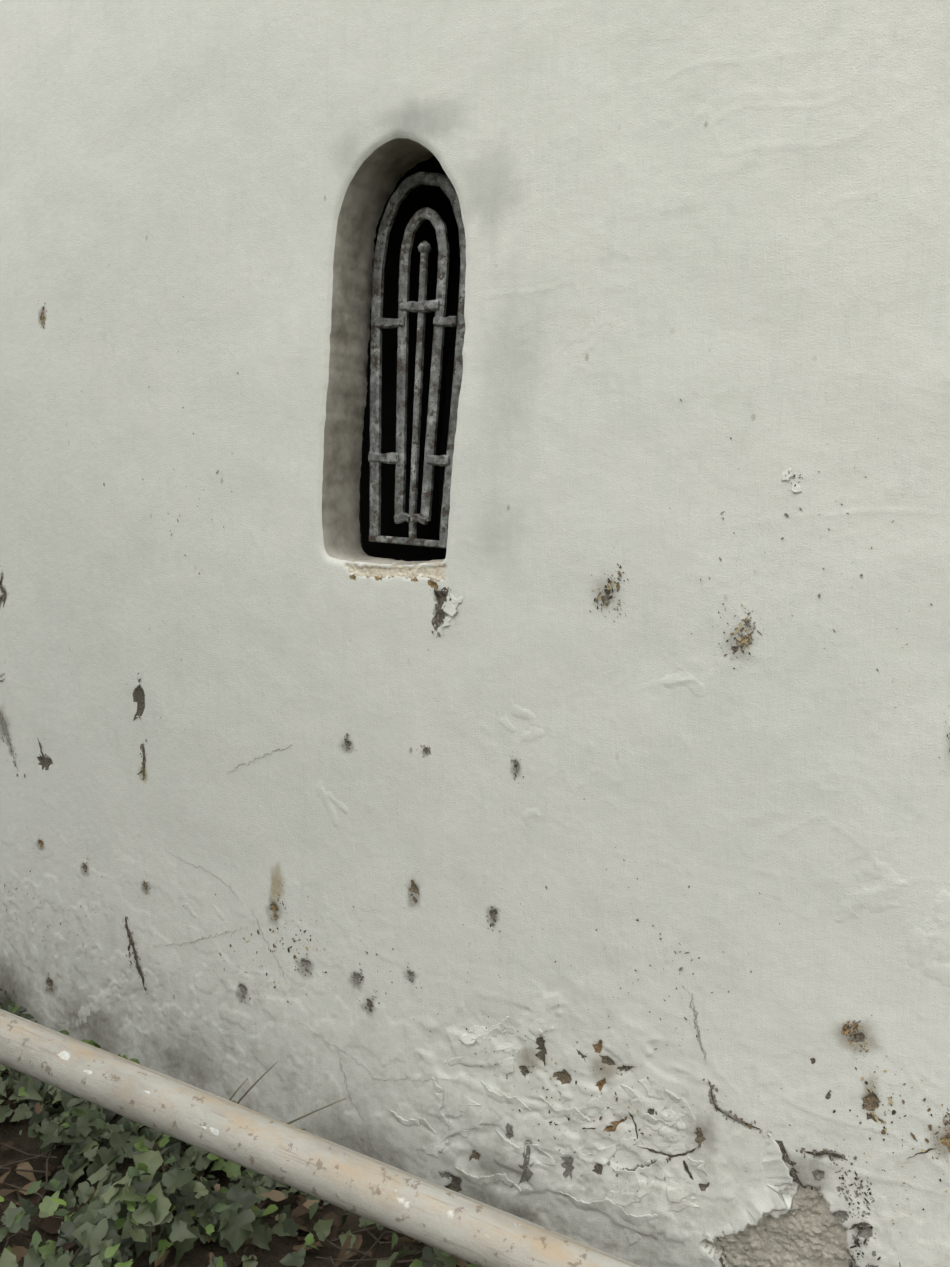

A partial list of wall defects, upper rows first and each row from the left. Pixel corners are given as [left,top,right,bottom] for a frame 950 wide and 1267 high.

peeling [345,561,463,637]
crack [0,716,25,778]
crack [690,993,707,1063]
peeling [389,1014,709,1245]
flaking render [862,1081,885,1123]
flaking render [698,1079,881,1267]